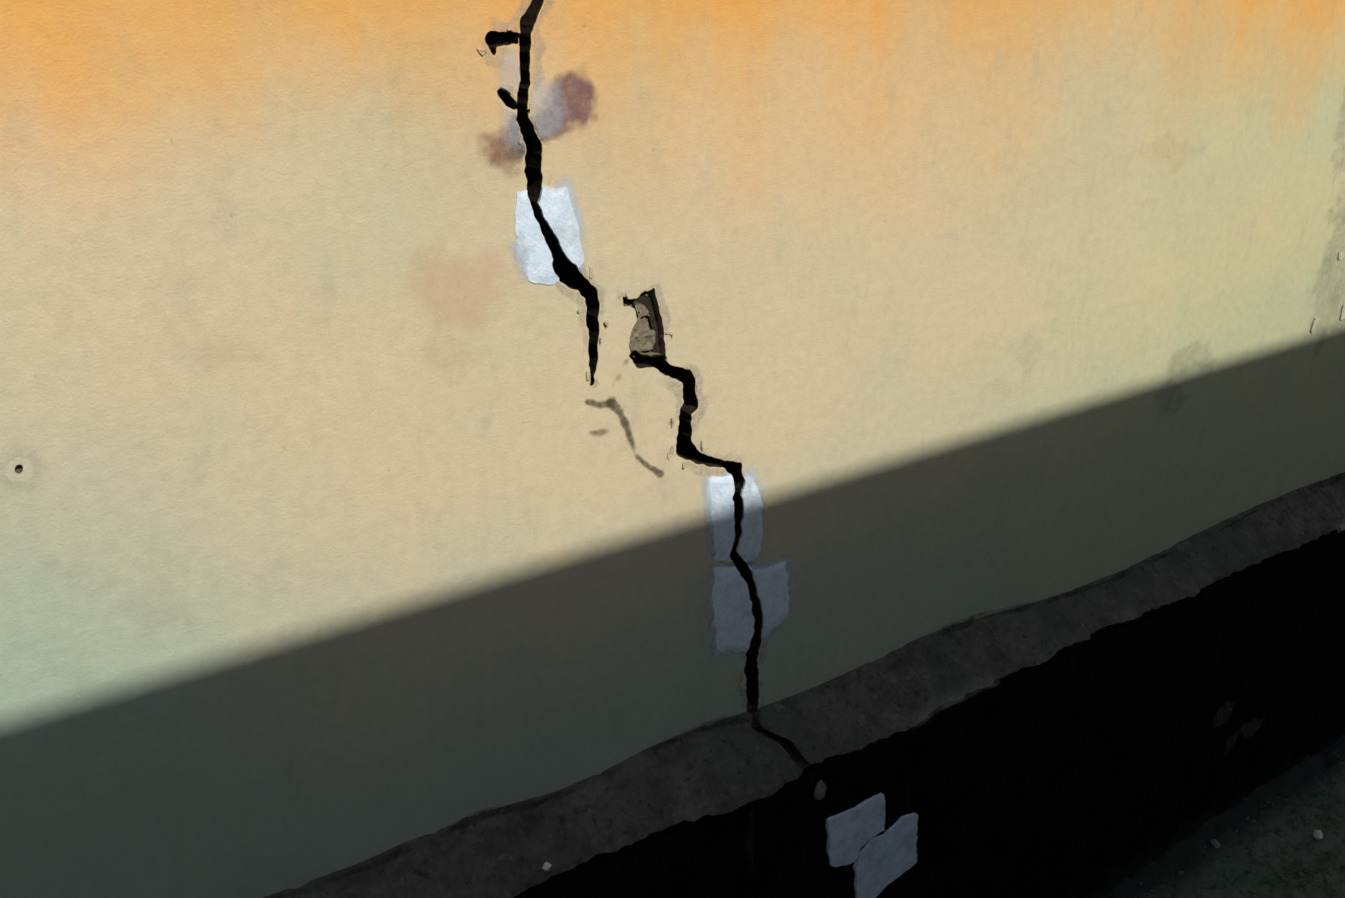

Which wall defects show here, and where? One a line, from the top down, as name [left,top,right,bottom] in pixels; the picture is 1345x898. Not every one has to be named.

water stain [535,73,593,140]
crack [477,0,810,769]